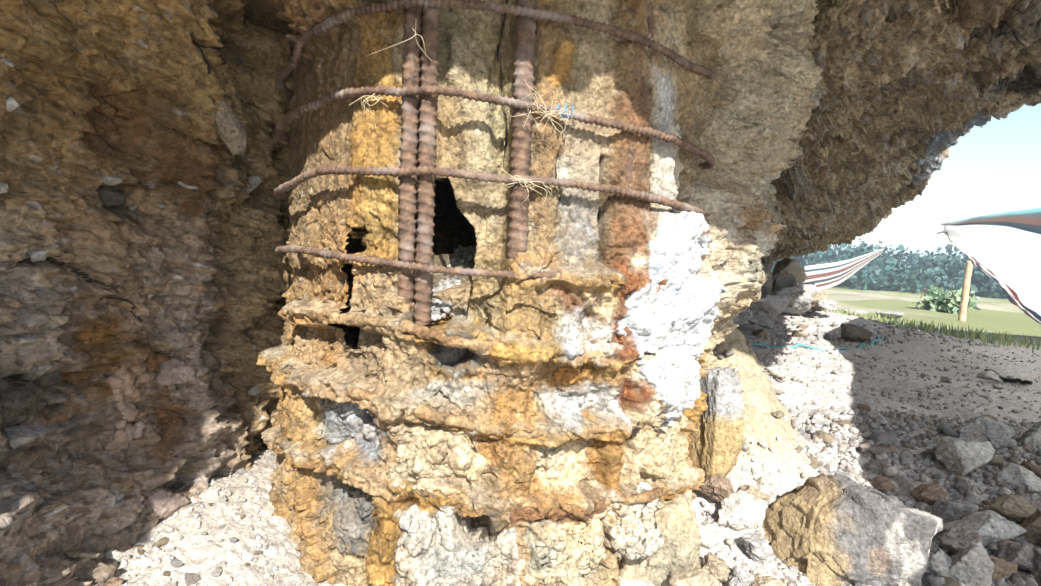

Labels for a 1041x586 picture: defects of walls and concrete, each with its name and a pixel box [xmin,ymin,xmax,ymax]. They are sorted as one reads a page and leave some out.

corrosion [550,39,577,84]
corrosion [351,32,402,260]
peeling [661,124,684,195]
corrosion [599,84,666,360]
spalling [550,284,594,323]
peeling [613,209,728,427]
spalling [435,344,479,379]
spalling [326,403,382,458]
spalling [543,382,631,430]
corrosion [617,380,654,407]
spalling [333,483,375,555]